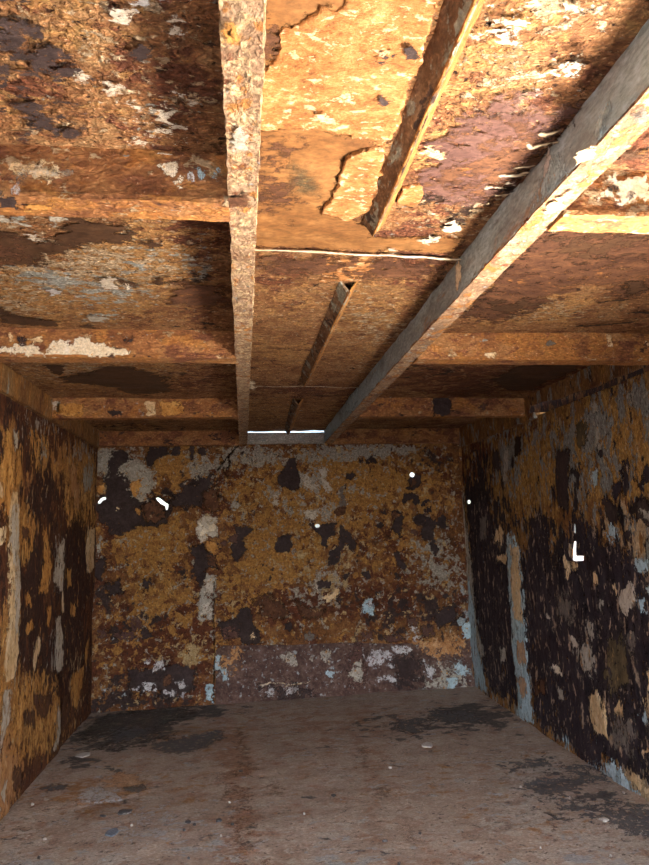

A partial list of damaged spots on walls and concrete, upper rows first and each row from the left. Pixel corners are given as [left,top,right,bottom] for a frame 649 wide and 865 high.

peeling [264,0,346,69]
corrosion [397,90,582,208]
corrosion [575,146,597,164]
peeling [597,185,635,201]
peeling [0,217,162,269]
peeling [0,286,61,346]
peeling [98,276,233,313]
corrosion [0,427,97,573]
corrosion [18,511,52,609]
corrosion [0,620,89,821]
damp [78,660,215,752]
damp [494,750,596,781]